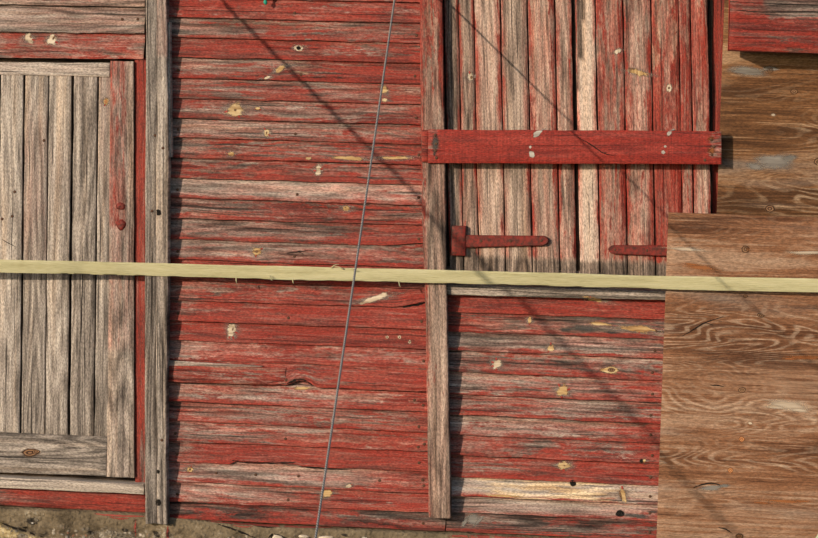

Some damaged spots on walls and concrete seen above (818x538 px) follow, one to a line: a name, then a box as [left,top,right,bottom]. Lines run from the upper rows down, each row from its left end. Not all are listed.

peeling [23,33,59,45]
peeling [222,102,263,118]
peeling [356,292,395,305]
peeling [227,324,238,339]
peeling [591,322,660,333]
crack [275,378,312,386]
peeling [554,384,570,399]